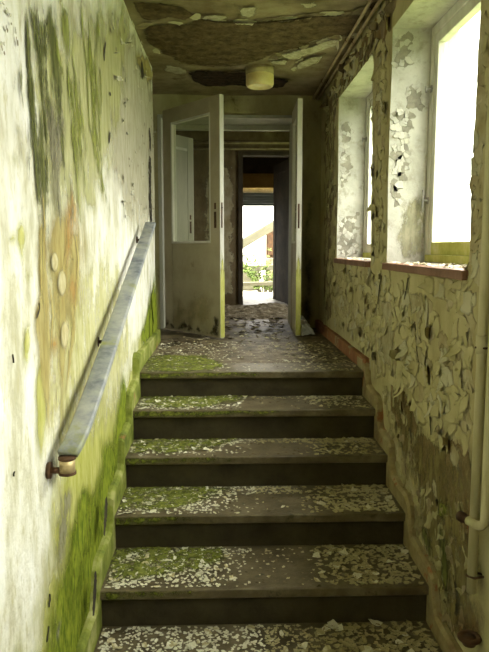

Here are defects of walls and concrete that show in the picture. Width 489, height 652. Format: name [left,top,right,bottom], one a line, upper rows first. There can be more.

water stain [20,0,105,448]
water stain [110,6,155,224]
peeling [115,0,489,633]
water stain [394,394,478,637]